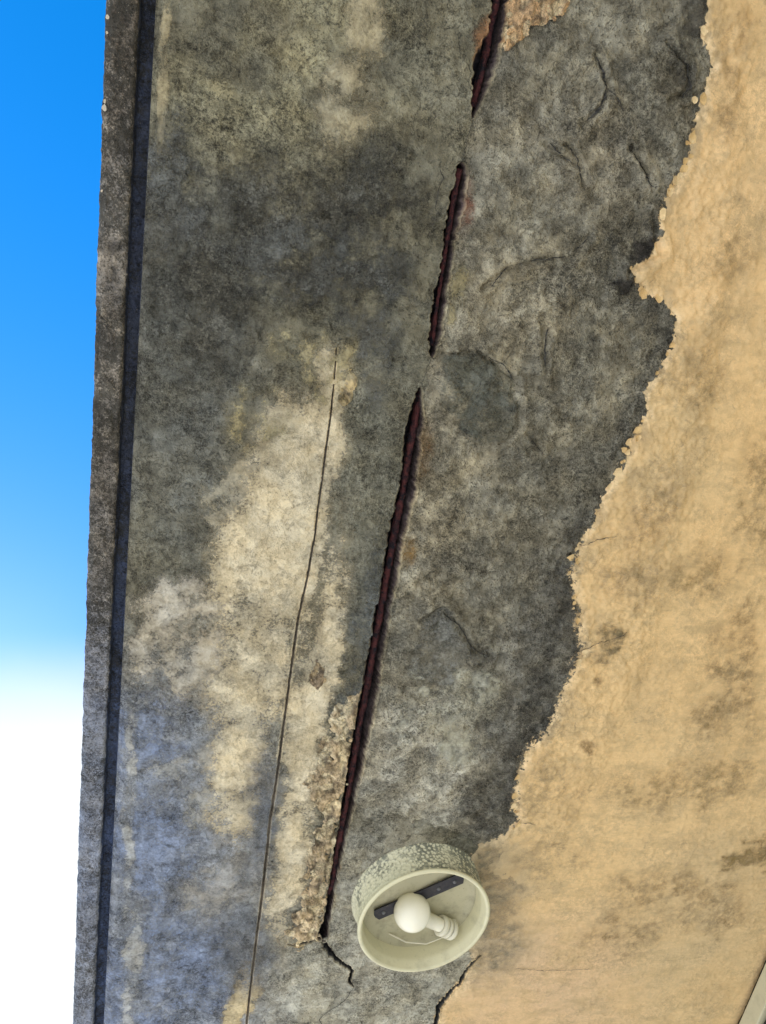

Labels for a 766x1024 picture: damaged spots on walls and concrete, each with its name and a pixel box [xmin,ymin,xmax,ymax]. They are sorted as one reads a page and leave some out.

corrosion [474,19,489,52]
water stain [141,114,442,406]
peeling [121,904,147,1024]
water stain [104,695,277,1024]
crack [244,347,339,1024]
water stain [341,553,382,705]
crack [287,0,510,1024]
peeling [120,0,713,952]
water stain [390,671,474,766]
water stain [471,672,503,711]